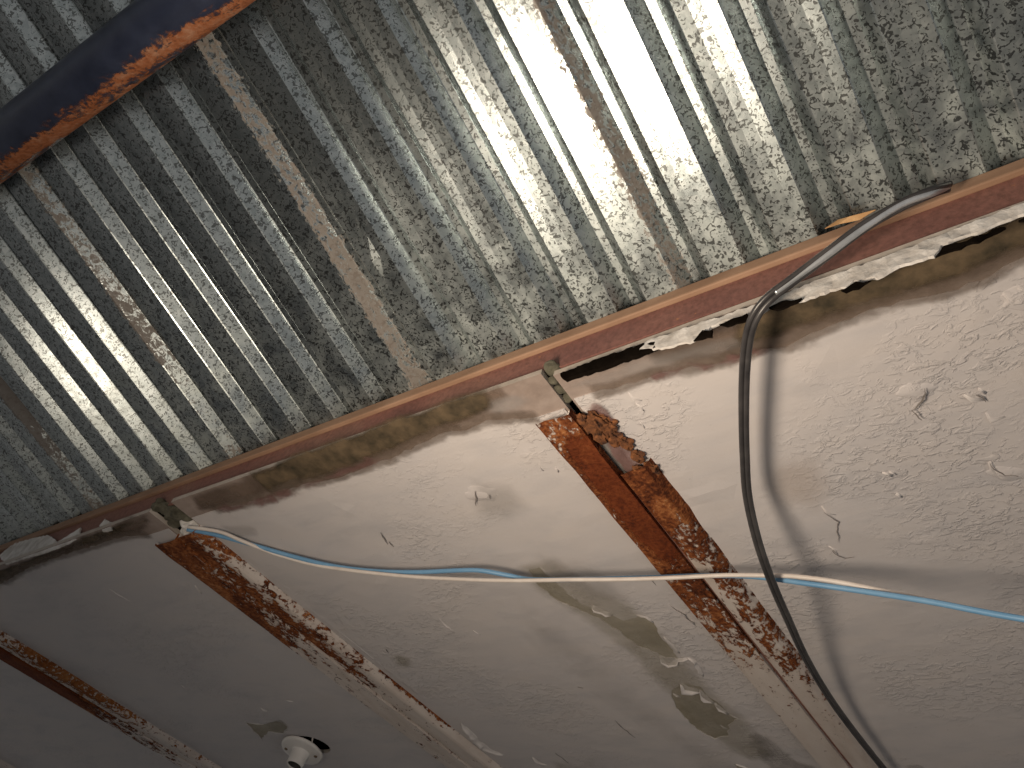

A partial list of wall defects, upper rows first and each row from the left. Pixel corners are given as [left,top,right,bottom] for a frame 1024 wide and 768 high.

rust [0,0,255,183]
spalling [694,313,749,342]
spalling [769,298,802,311]
damp [592,217,1024,397]
spalling [841,280,871,294]
spalling [935,227,1006,258]
rust [0,632,209,768]
rust [155,525,455,759]
peeling [529,567,739,738]
rust [536,405,826,716]